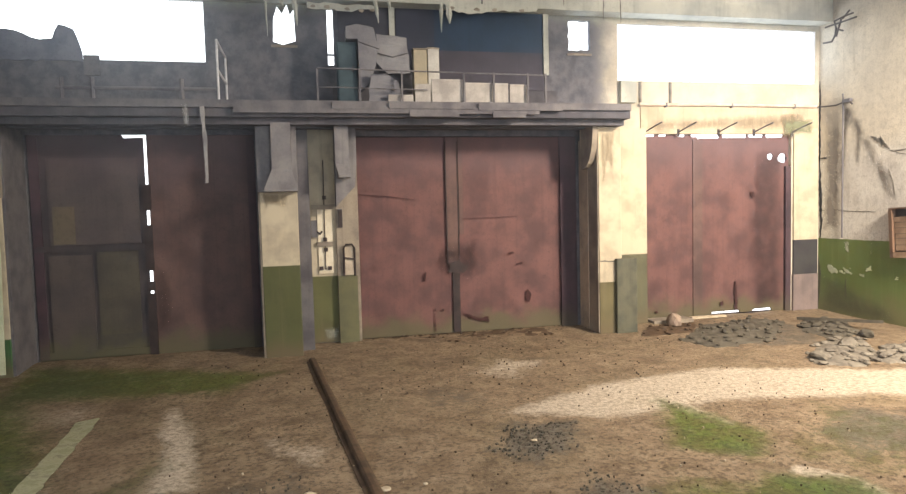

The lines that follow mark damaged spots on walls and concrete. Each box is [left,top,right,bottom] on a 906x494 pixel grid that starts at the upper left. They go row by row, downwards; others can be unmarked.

peeling [827,265,872,277]